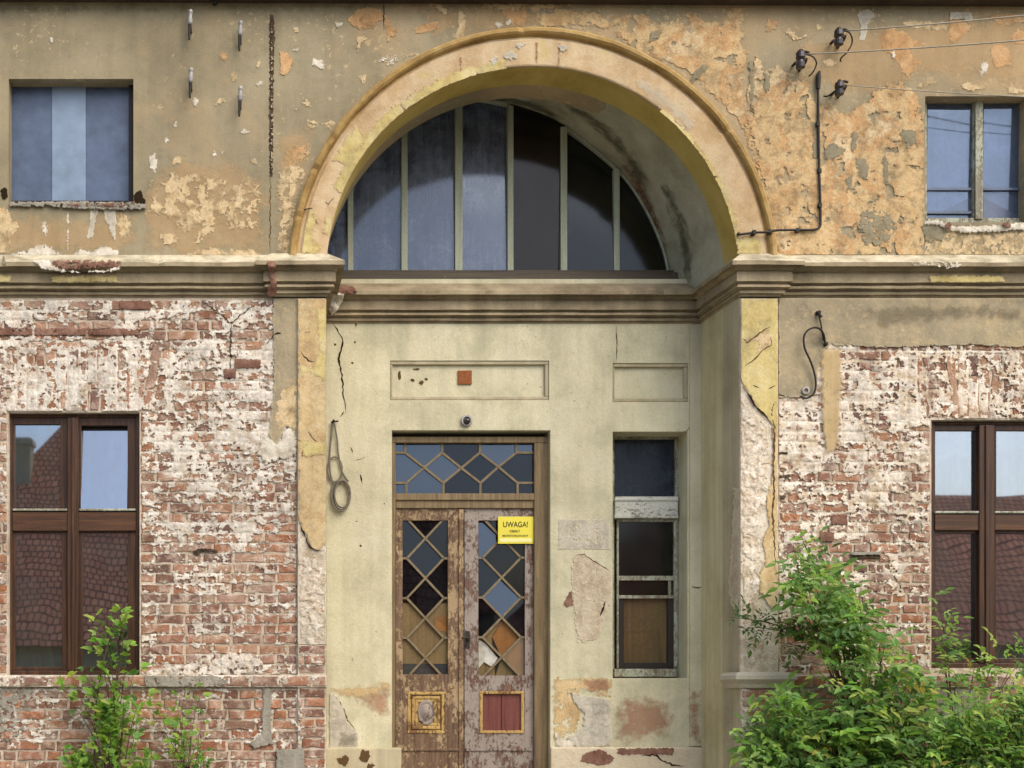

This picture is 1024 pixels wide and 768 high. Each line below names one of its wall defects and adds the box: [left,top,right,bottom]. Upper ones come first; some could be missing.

peeling [334,6,398,52]
peeling [414,4,466,38]
peeling [256,28,310,253]
peeling [485,4,1024,266]
peeling [68,153,261,255]
crack [205,305,251,368]
crack [267,323,346,417]
crack [743,327,776,563]
peeling [0,299,375,768]
peeling [741,344,1024,673]
flaking render [564,553,612,643]
spalling [555,692,674,765]